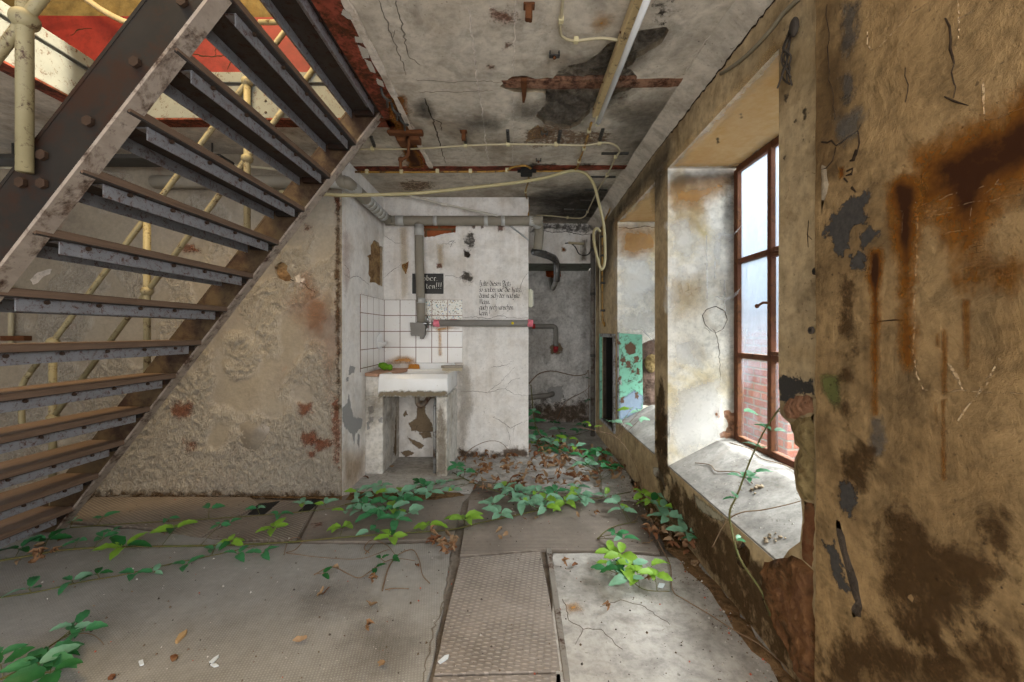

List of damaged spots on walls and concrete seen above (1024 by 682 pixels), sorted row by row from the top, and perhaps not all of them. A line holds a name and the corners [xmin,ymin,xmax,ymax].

crack [379,1,499,163]
crack [944,18,969,106]
flaking render [368,241,380,285]
peeling [822,188,881,271]
corrosion [866,94,1024,415]
crack [695,287,728,378]
corrosion [169,400,193,419]
peeling [300,395,433,468]
corrosion [937,331,947,479]
flaking render [760,375,862,682]
crack [562,599,668,650]
water stain [811,505,1020,682]